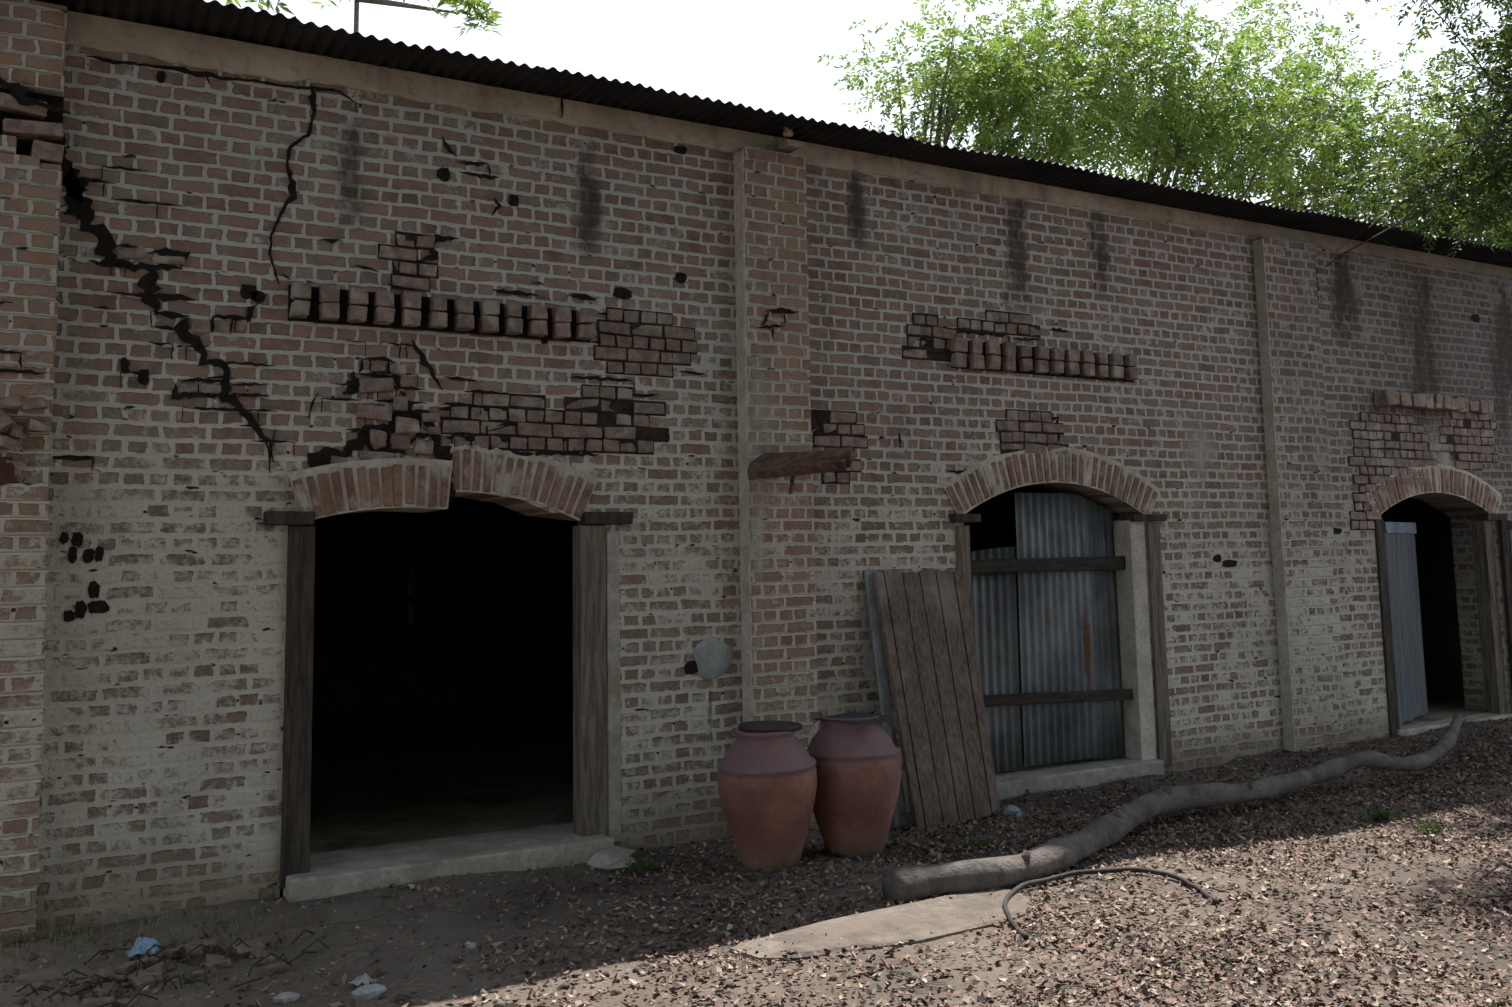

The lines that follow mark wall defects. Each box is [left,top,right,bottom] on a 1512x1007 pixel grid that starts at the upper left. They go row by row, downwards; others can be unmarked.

spalling [0,395,51,486]
crack [0,56,705,502]